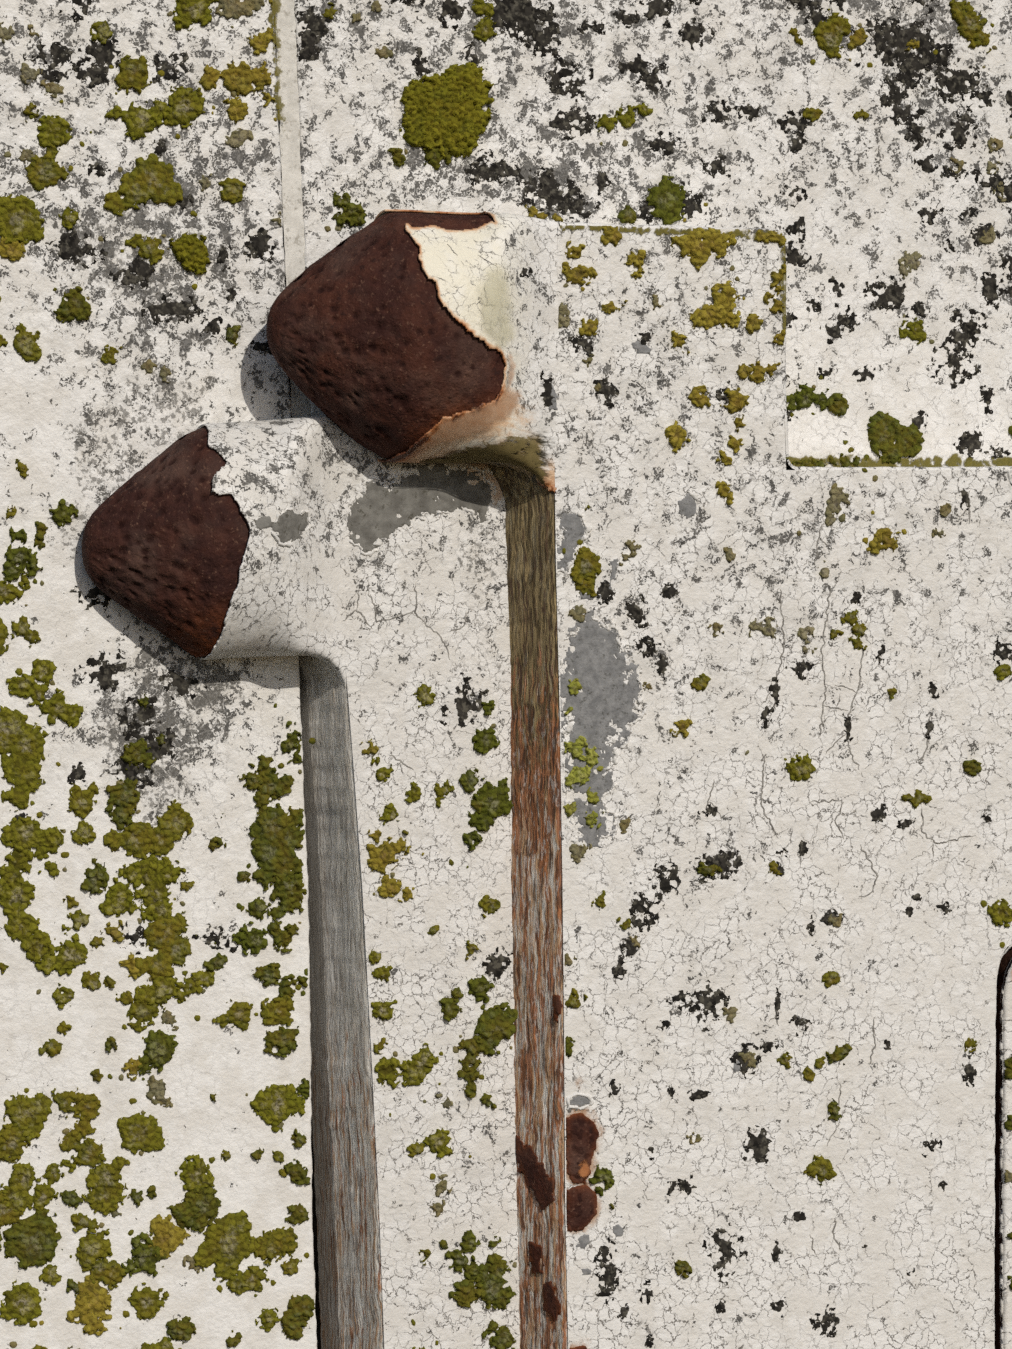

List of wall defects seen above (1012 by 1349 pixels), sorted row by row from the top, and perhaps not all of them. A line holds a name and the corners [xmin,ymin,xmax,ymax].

crack [343,586,466,659]
crack [766,523,864,769]
crack [919,714,937,763]
crack [760,756,778,838]
crack [809,799,879,897]
crack [921,808,976,857]
crack [868,1016,876,1065]
rust [515,1109,599,1232]
crack [810,1221,840,1254]
rust [528,1241,561,1322]